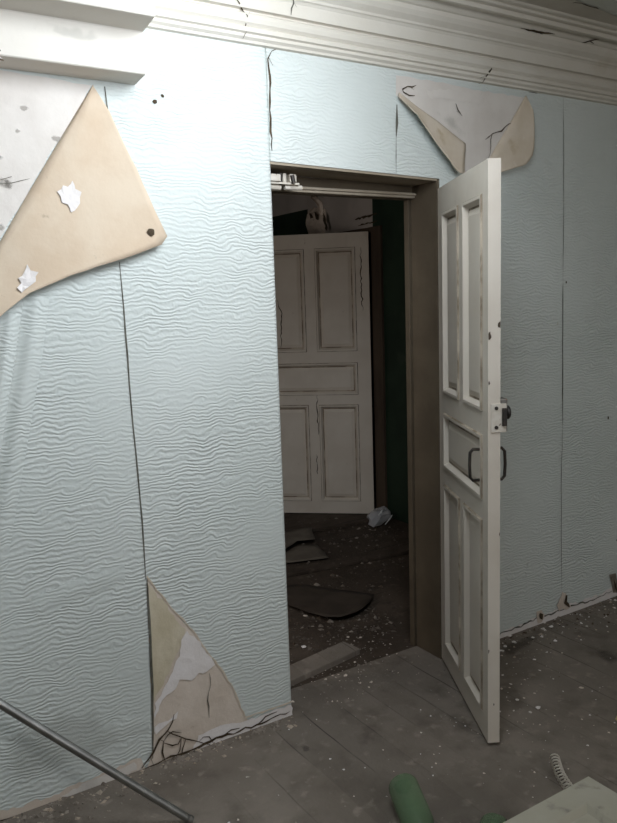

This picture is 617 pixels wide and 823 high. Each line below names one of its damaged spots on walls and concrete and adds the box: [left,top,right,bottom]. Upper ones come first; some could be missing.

crack [521,27,553,35]
flaking render [396,75,535,174]
peeling [0,50,167,317]
flaking render [500,573,617,638]
flaking render [0,576,293,822]
crack [142,712,289,769]